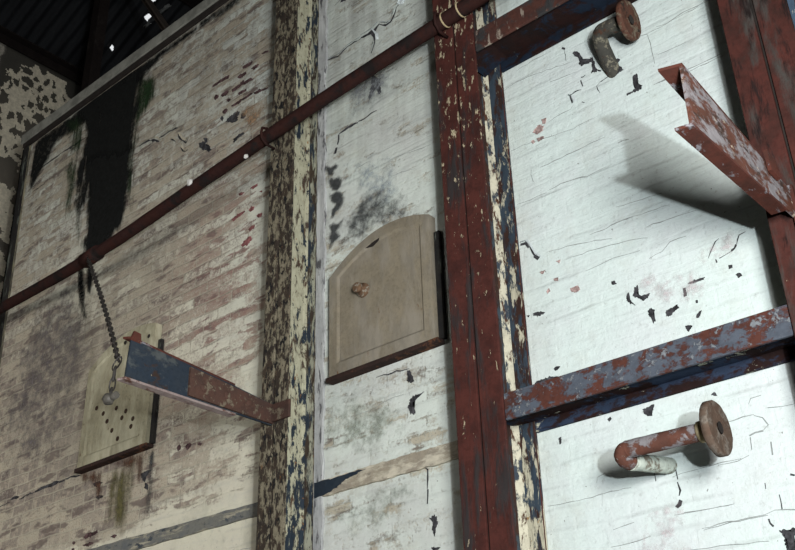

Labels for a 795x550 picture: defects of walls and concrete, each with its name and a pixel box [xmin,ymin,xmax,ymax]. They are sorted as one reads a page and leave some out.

crack [327,3,397,60]
peeling [0,64,71,172]
spalling [212,61,268,123]
water stain [66,69,155,251]
peeling [0,183,16,297]
flaking render [231,206,262,247]
water stain [349,187,404,236]
spalling [408,392,423,415]
spalling [779,527,795,550]